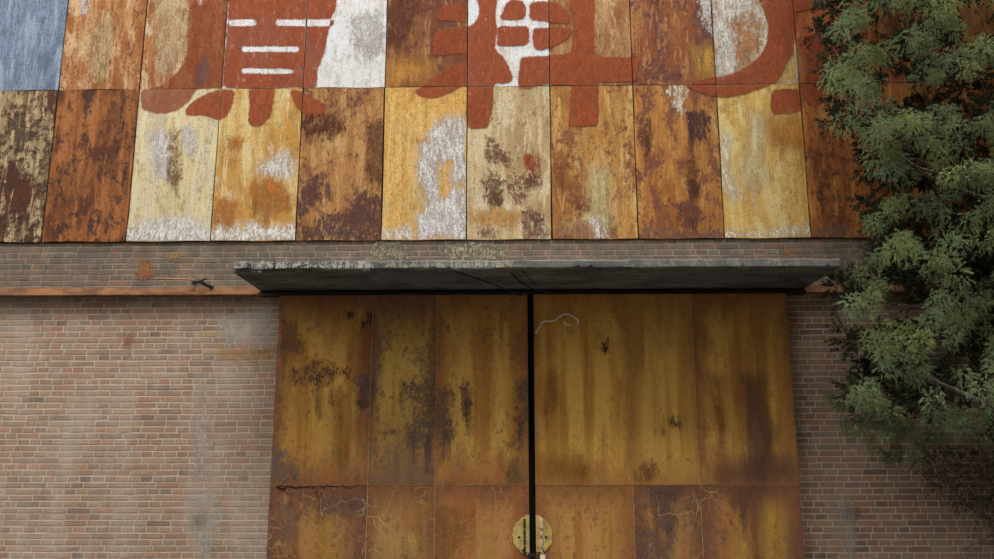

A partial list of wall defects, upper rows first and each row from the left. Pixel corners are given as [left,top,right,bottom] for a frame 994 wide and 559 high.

rust [729,10,765,61]
rust [780,55,796,82]
rust [166,129,183,196]
rust [212,195,237,231]
rust [250,178,289,229]
rust [296,118,384,240]
peeling [382,114,466,240]
rust [470,137,592,239]
rust [382,377,472,470]
crack [271,479,434,559]
crack [637,481,730,559]